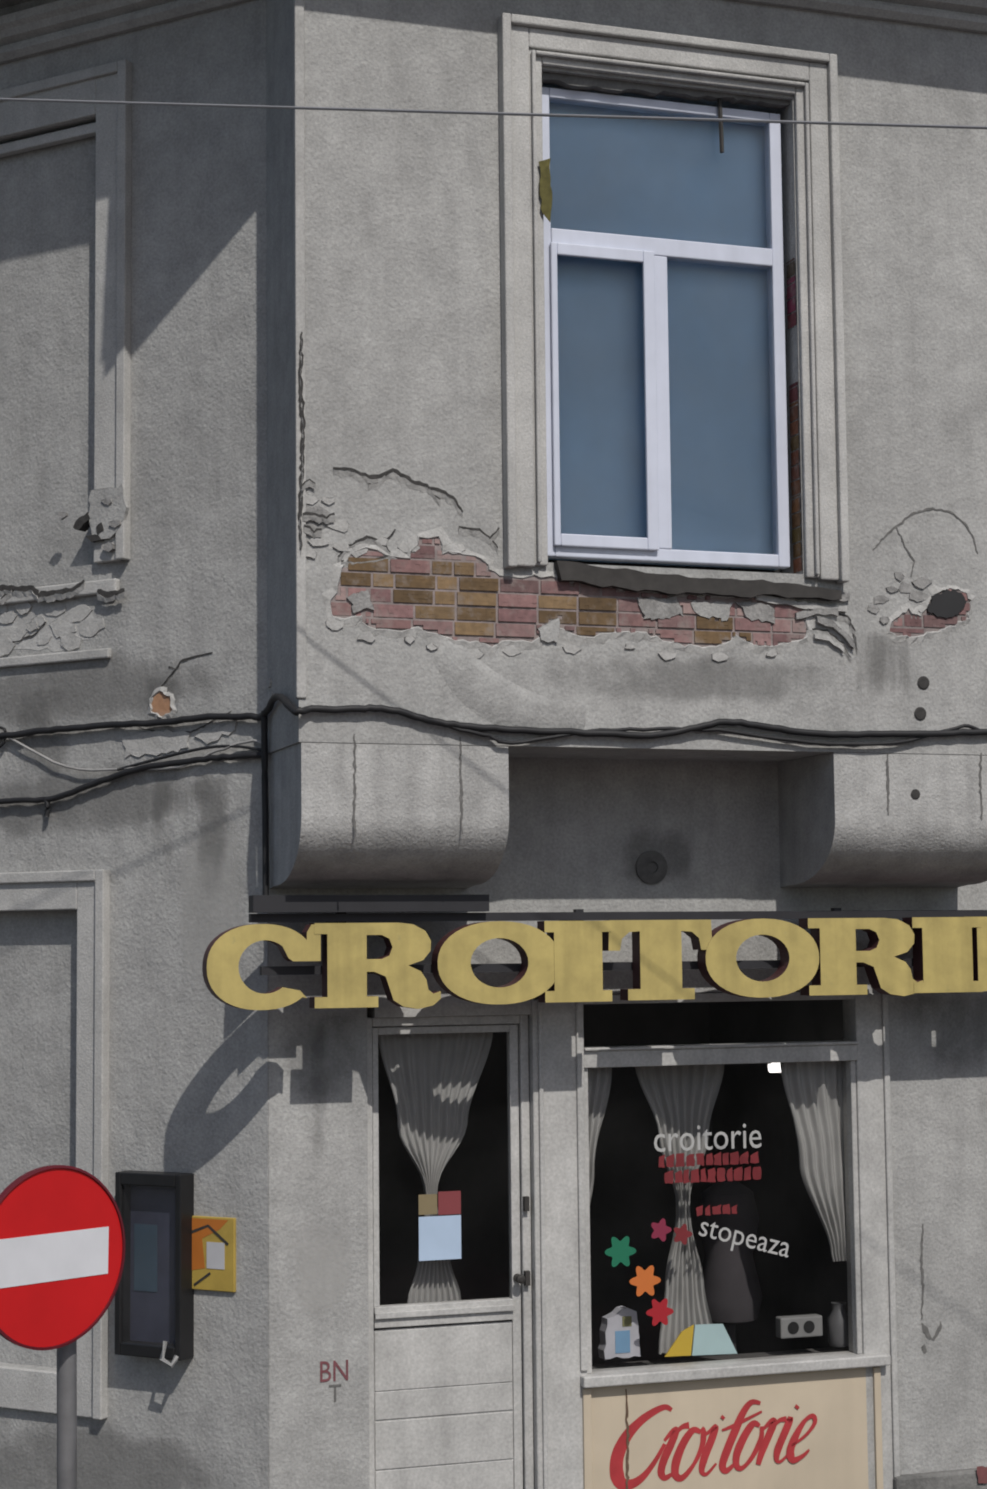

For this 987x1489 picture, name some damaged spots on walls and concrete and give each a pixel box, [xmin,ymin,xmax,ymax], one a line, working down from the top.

flaking render [786,258,796,329]
crack [298,332,500,568]
flaking render [789,381,802,573]
flaking render [56,484,129,552]
peeling [0,598,105,657]
flaking render [306,494,855,662]
flaking render [867,572,976,646]
flaking render [147,685,177,719]